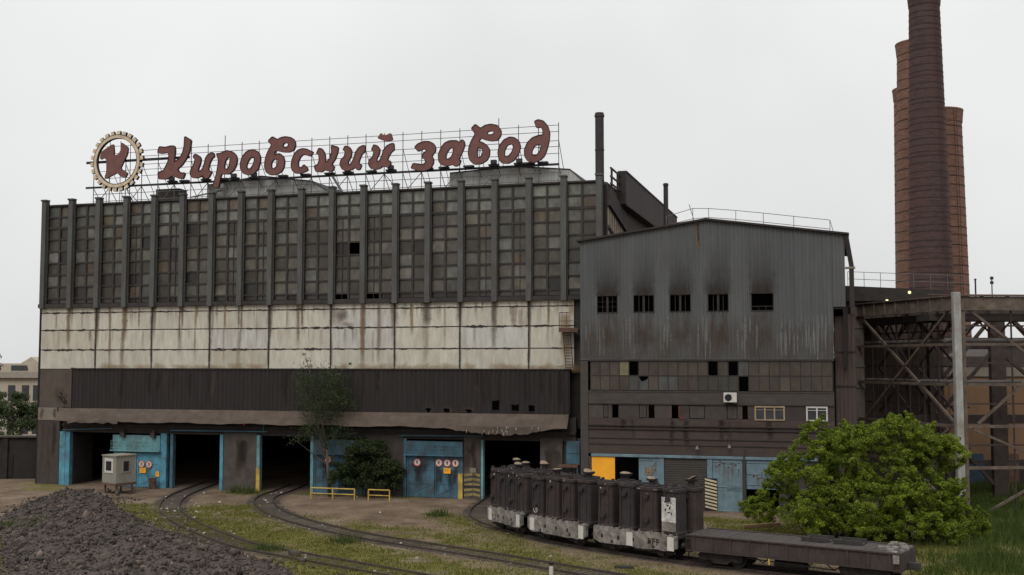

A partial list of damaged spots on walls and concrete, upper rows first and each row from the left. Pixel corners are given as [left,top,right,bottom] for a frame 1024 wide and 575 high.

rust [109,307,140,352]